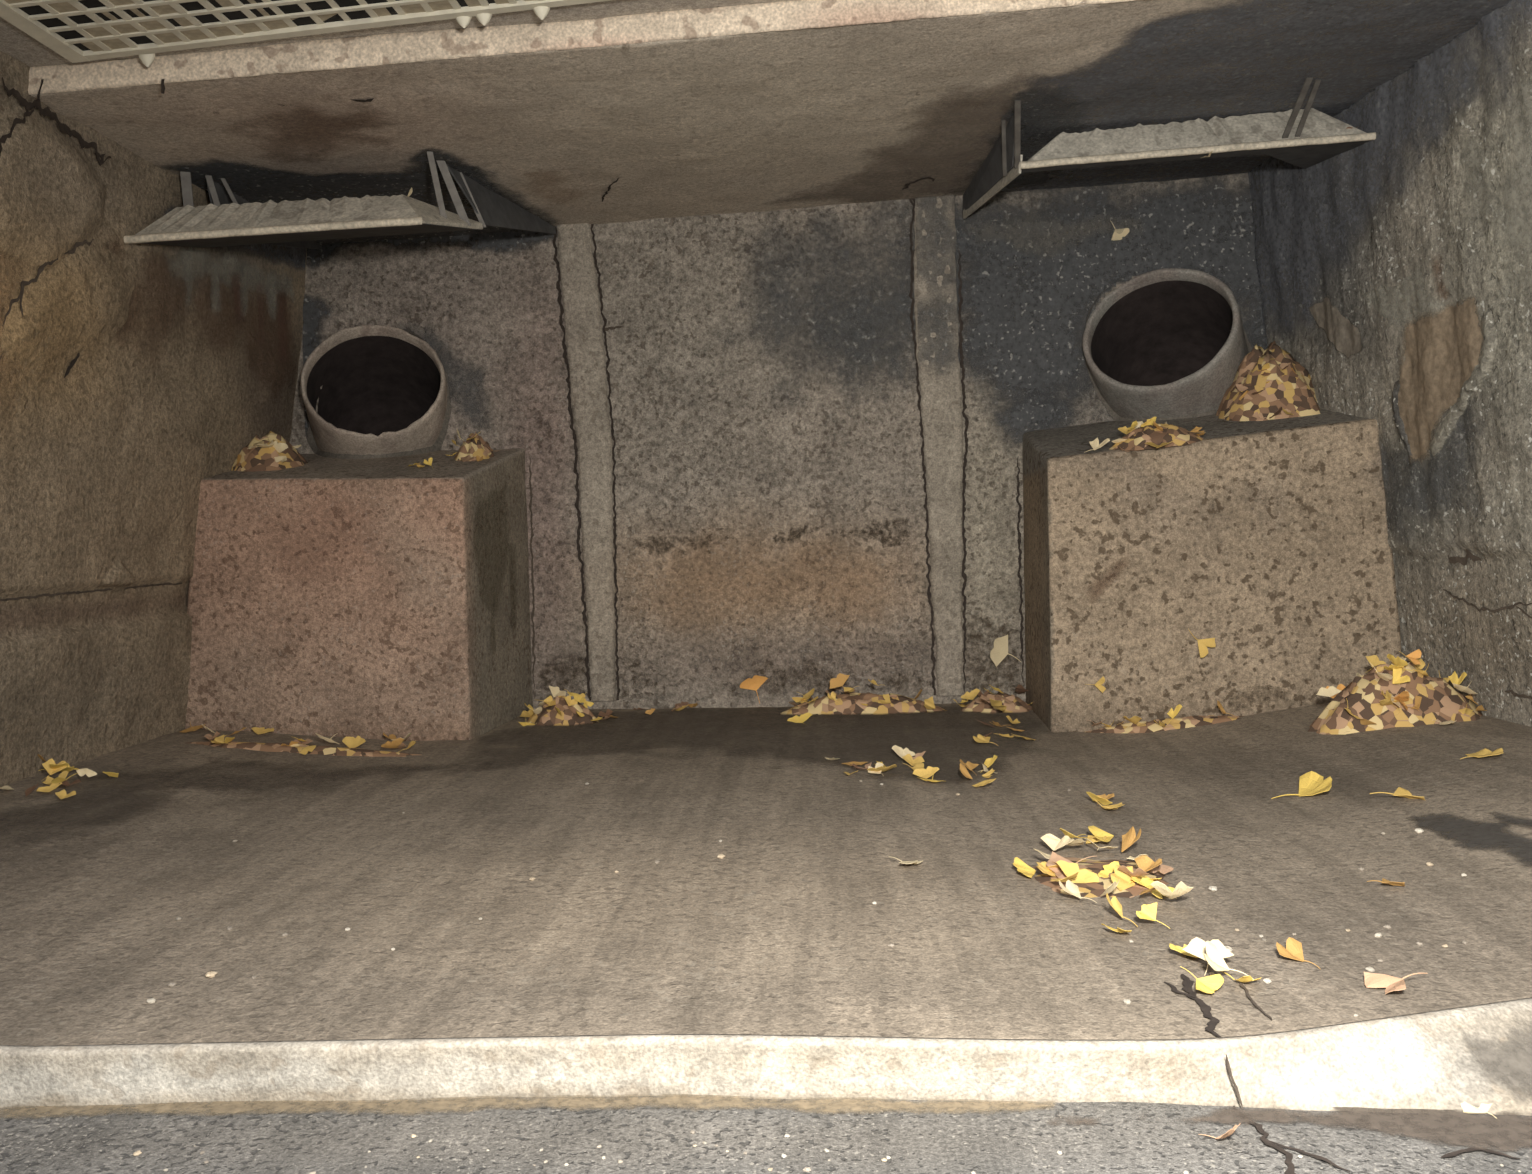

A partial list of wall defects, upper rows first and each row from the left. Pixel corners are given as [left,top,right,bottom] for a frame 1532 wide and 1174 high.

crack [0,77,111,166]
crack [0,239,95,360]
crack [64,352,80,378]
crack [552,178,623,700]
crack [903,177,969,695]
flaking render [1392,298,1497,465]
crack [528,456,536,694]
crack [1443,549,1532,619]
crack [1505,690,1532,699]
damp [1412,814,1532,865]
crack [1164,974,1350,1174]
crack [1441,1147,1520,1159]